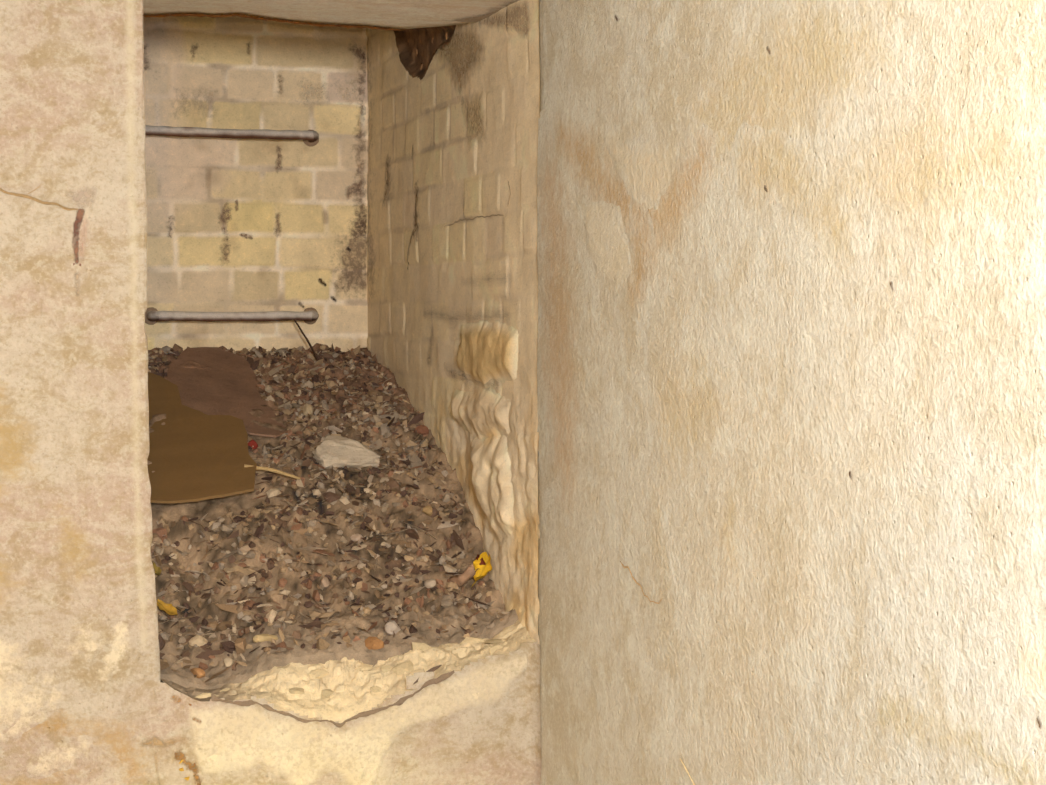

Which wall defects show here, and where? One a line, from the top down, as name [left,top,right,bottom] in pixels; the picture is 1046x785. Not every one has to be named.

spalling [394,25,456,80]
leakage [439,0,528,88]
crack [0,185,78,211]
corrosion [72,190,91,286]
leakage [319,131,367,302]
peeling [160,620,536,785]
corrosion [143,738,201,785]